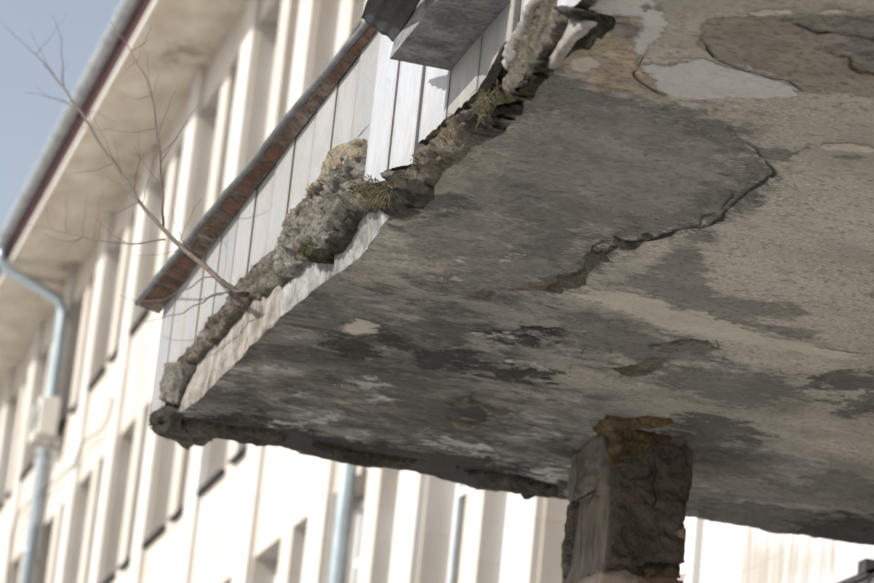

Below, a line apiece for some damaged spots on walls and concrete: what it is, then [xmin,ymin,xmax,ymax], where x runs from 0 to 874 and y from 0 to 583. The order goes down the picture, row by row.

peeling [744,9,874,17]
spalling [149,0,798,450]
leakage [181,68,874,500]
crack [574,127,776,290]
peeling [540,233,868,377]
spalling [312,441,418,468]
spalling [456,435,694,579]
leakage [693,470,874,544]